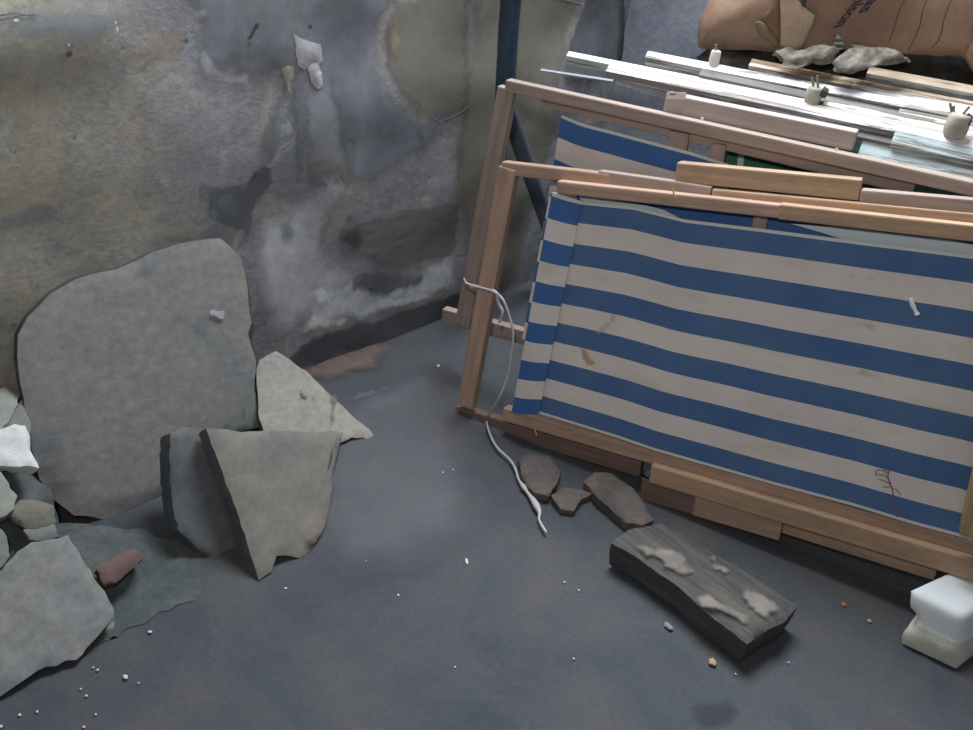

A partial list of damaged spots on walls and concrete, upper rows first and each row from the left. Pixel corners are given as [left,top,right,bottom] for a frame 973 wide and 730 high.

crack [0,13,35,21]
spalling [200,168,271,233]
water stain [199,0,460,368]